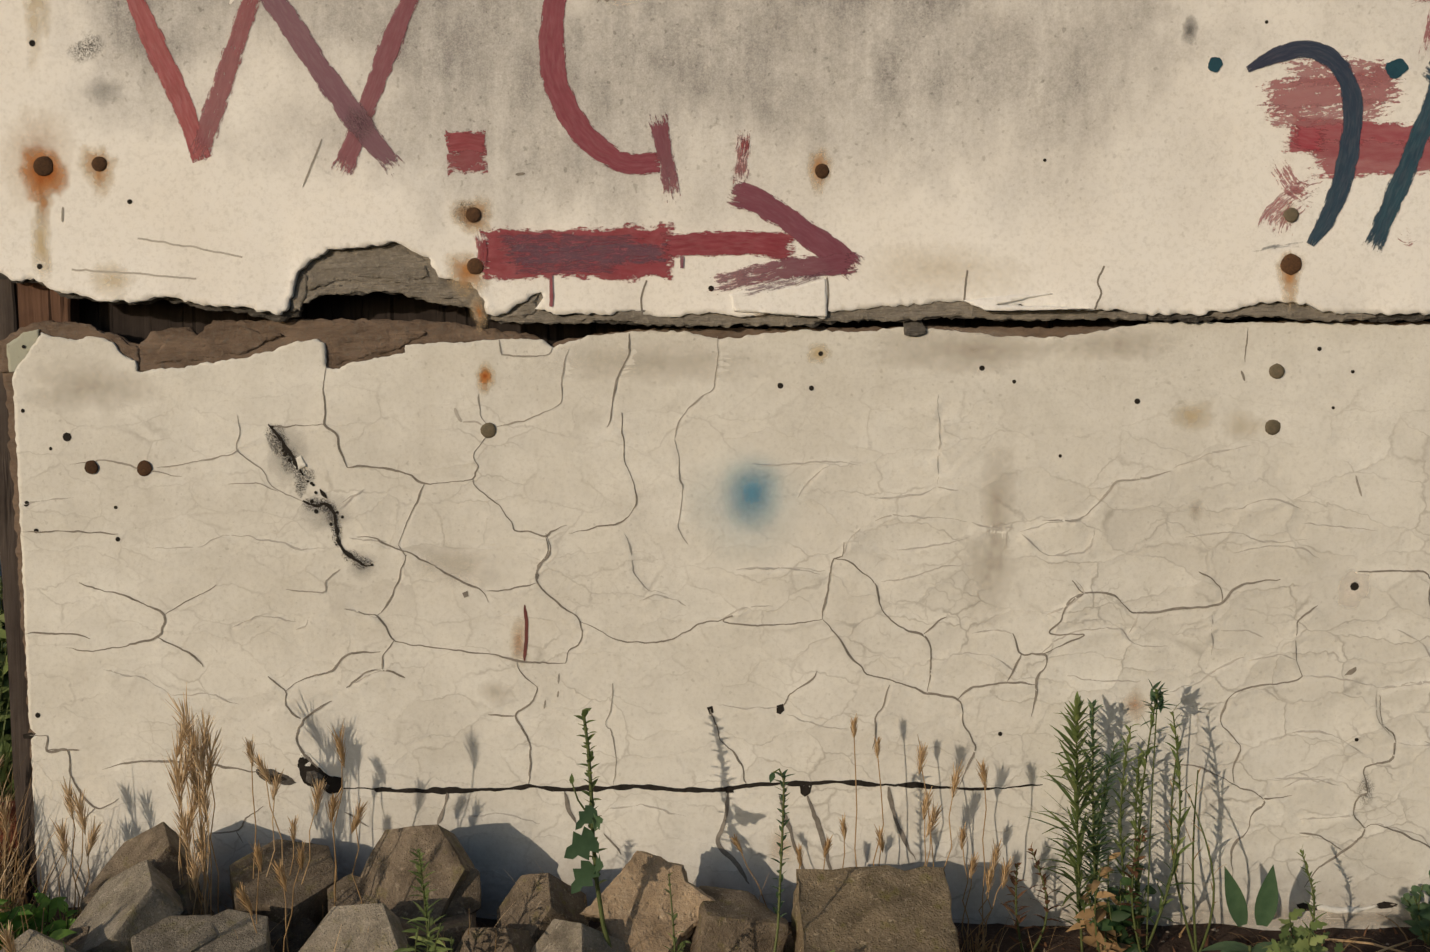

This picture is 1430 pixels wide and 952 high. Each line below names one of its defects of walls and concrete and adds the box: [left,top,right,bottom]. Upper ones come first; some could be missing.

corrosion [23,151,65,213]
corrosion [85,154,109,185]
corrosion [456,204,484,228]
spalling [0,242,1147,373]
corrosion [1281,270,1298,299]
corrosion [479,367,491,390]
crack [76,416,302,501]
crack [268,277,1280,884]
crack [27,583,216,667]
crack [30,735,258,824]
crack [1180,605,1318,877]
crack [1299,697,1430,908]